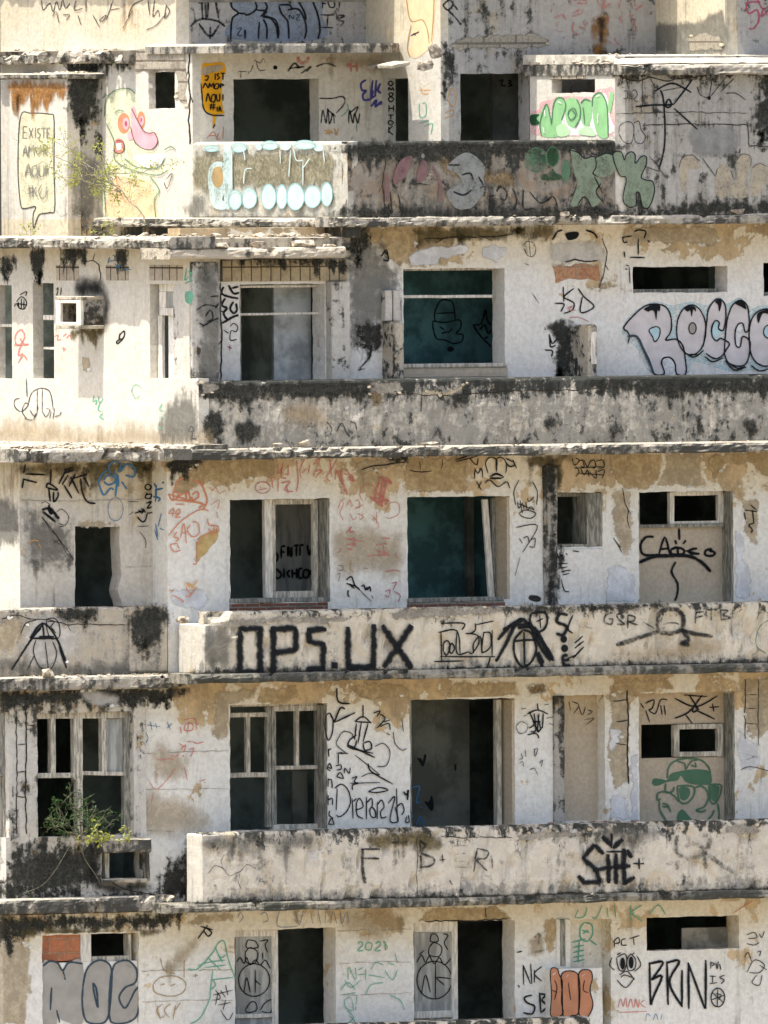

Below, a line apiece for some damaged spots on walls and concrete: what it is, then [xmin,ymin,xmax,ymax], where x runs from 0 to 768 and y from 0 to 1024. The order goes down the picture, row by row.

corrosion [592,16,608,55]
corrosion [8,80,67,116]
damp [63,63,134,142]
damp [330,137,634,174]
peeling [361,227,418,265]
peeling [550,241,605,283]
peeling [623,226,721,246]
damp [159,372,383,444]
peeling [610,451,768,561]
damp [127,603,174,661]
peeling [212,685,298,740]
damp [0,828,768,957]